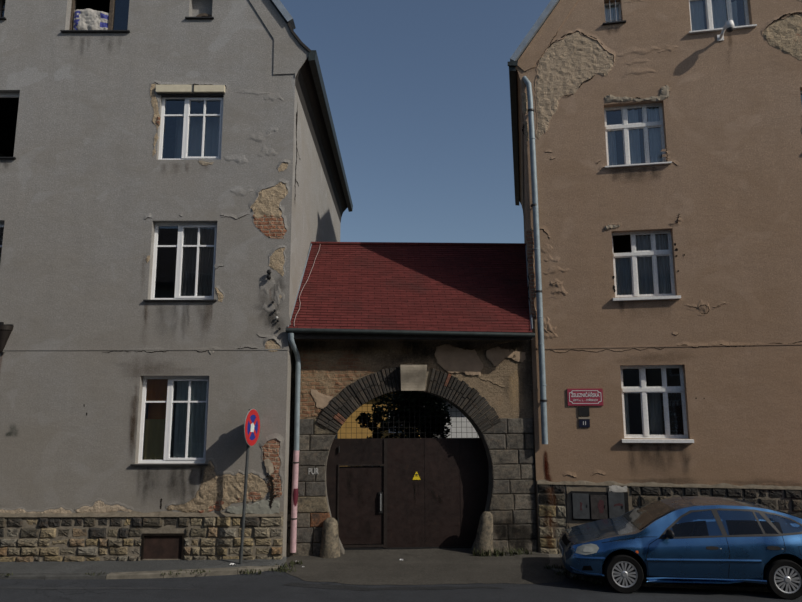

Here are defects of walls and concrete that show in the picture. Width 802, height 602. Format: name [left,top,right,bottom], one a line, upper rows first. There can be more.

flaking render [760,0,802,61]
flaking render [521,28,616,141]
flaking render [149,83,161,157]
flaking render [248,159,291,277]
crack [108,346,169,354]
crack [193,332,285,352]
flaking render [435,344,527,376]
crack [546,330,802,353]
flaking render [165,433,285,514]